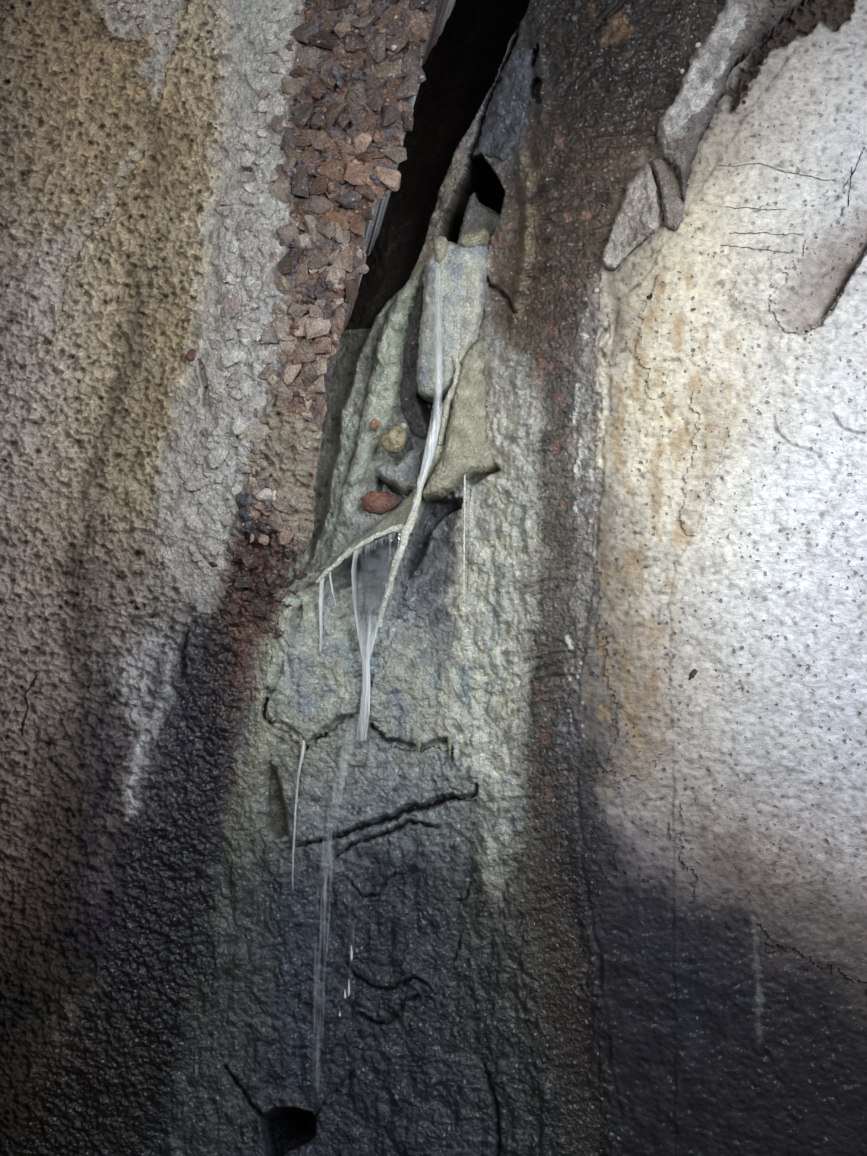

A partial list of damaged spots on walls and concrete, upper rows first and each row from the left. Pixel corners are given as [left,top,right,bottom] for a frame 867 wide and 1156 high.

crack [345,0,589,330]
flaking render [144,0,435,646]
rust [210,503,292,818]
crack [306,716,388,749]
crack [296,796,465,898]
crack [347,963,428,1025]
leakage [262,0,867,1156]